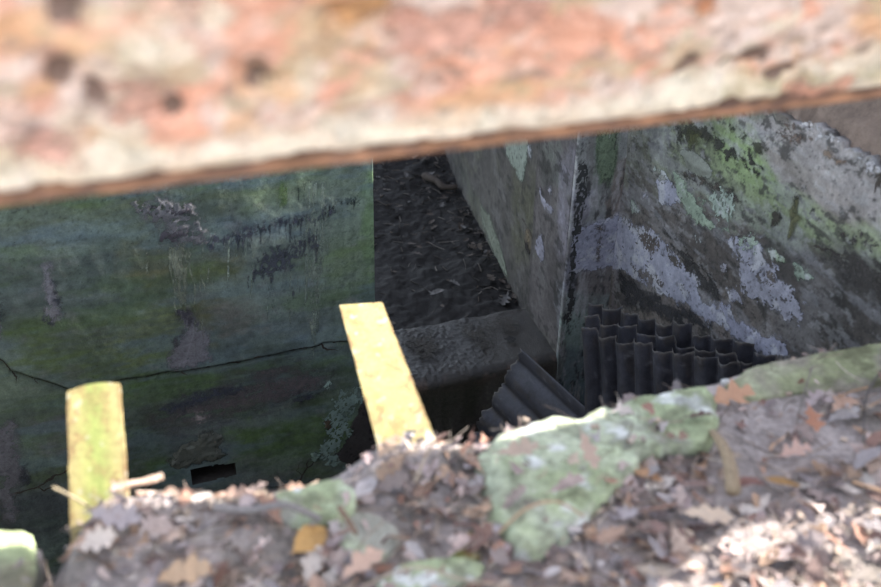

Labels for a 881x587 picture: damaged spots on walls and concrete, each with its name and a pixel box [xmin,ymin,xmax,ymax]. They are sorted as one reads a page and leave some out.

water stain [169,246,209,309]
water stain [206,181,359,345]
crack [0,359,70,390]
crack [112,341,345,383]